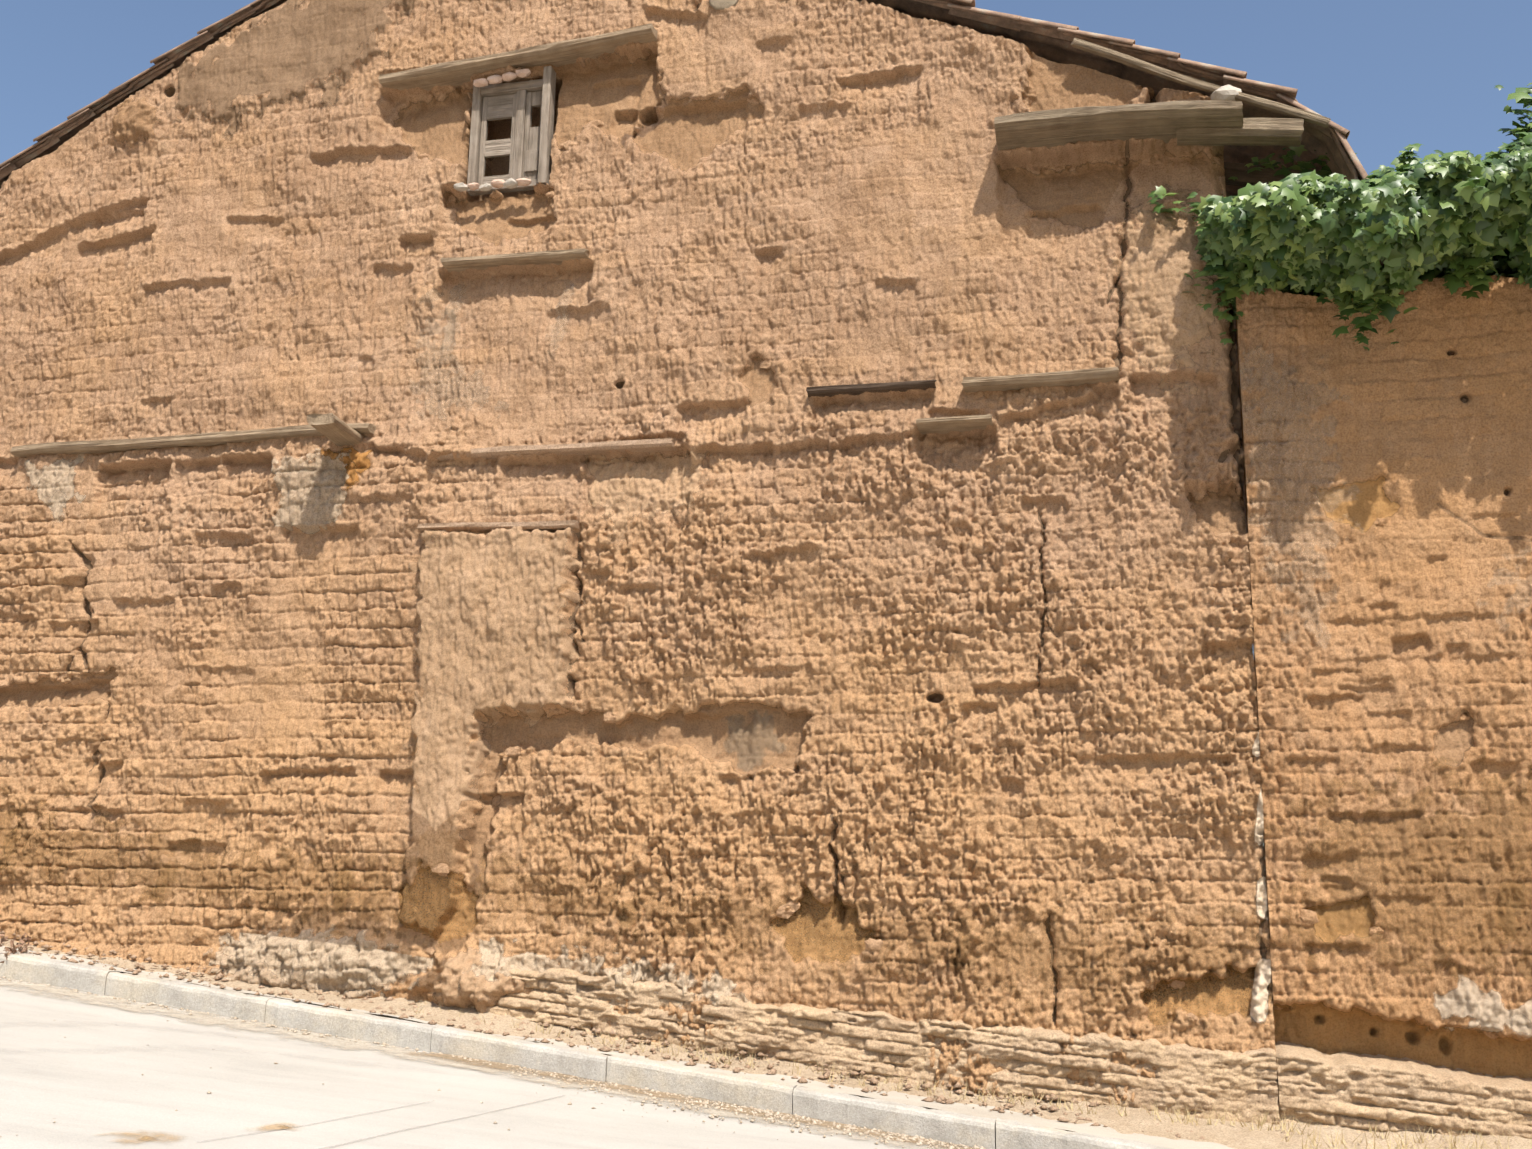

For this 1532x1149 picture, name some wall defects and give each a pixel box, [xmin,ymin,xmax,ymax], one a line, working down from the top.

crack [1107,140,1132,372]
crack [1218,310,1244,498]
crack [65,545,94,674]
crack [1036,513,1058,687]
crack [88,708,110,812]
spalling [398,702,812,955]
spalling [771,888,884,963]
spalling [1140,965,1256,1026]
crack [1250,732,1271,1023]
spalling [1273,976,1532,1078]